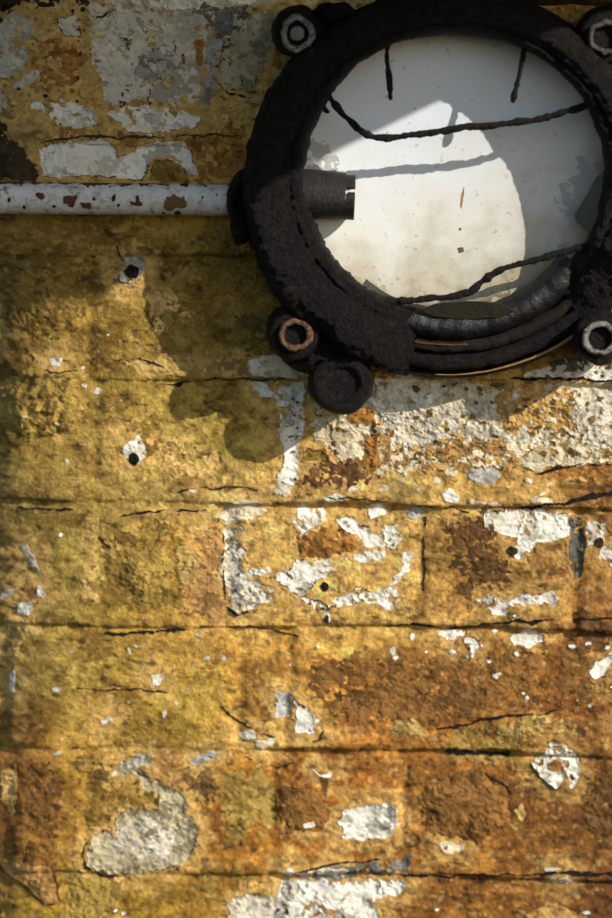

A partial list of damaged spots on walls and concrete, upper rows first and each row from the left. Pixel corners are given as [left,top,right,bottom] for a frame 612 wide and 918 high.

spalling [0,0,280,207]
spalling [122,352,612,623]
crack [507,491,612,510]
crack [103,533,300,638]
corrosion [308,608,612,731]
corrosion [10,761,67,889]
spalling [77,745,209,883]
spalling [227,854,413,918]
corrosion [319,774,329,794]
crack [427,709,558,795]
crack [400,870,612,879]
corrosion [547,758,564,771]